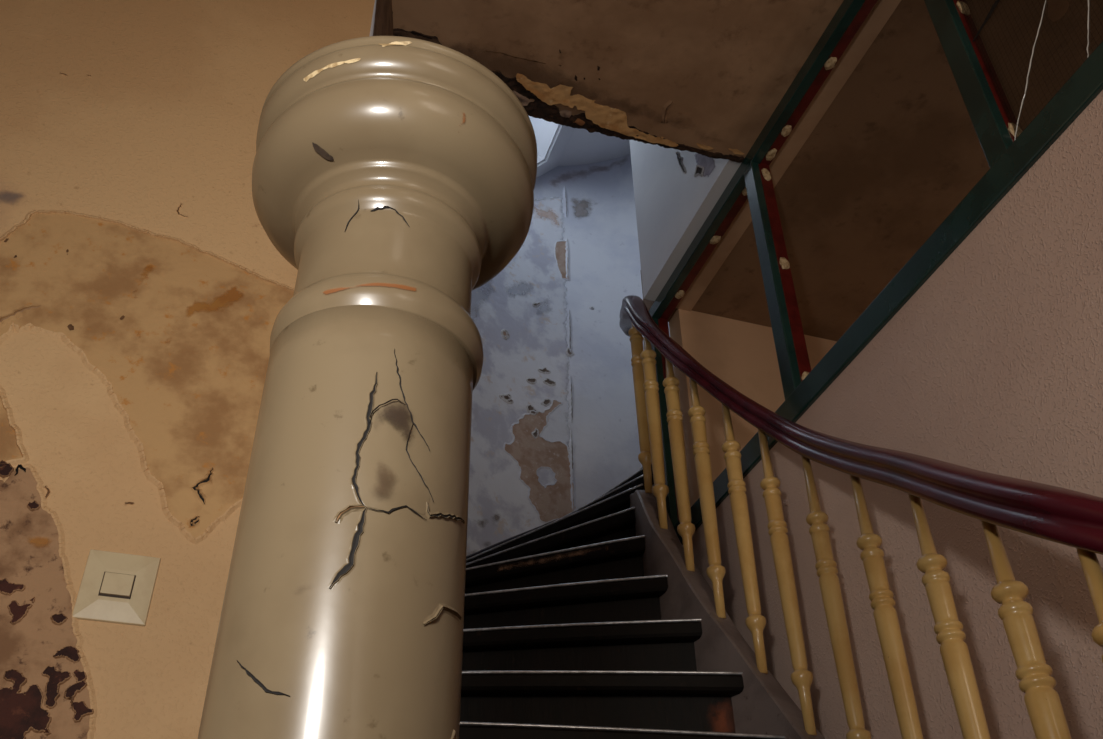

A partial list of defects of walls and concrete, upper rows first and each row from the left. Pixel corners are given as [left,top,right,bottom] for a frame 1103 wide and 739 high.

flaking render [379,28,442,47]
flaking render [492,70,744,178]
flaking render [0,385,97,739]
flaking render [0,210,295,544]
crack [237,660,289,696]
crack [328,349,465,590]
peeling [466,197,578,556]